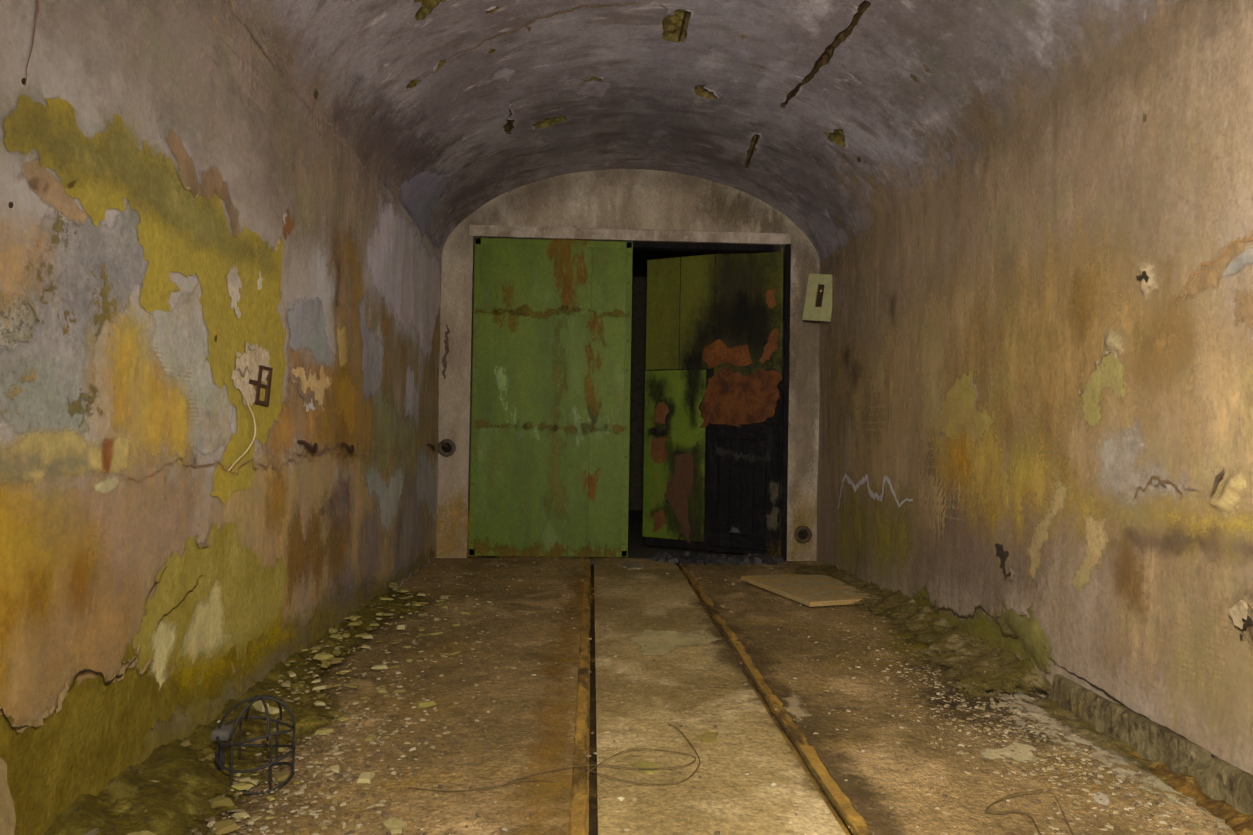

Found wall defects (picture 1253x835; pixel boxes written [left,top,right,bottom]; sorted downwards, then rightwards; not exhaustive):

crack [25,0,39,86]
spalling [411,0,449,21]
spalling [661,9,694,43]
peeling [0,78,333,504]
water stain [0,0,470,727]
rust [475,238,628,435]
water stain [825,0,1253,714]
peeling [106,522,289,694]
peeling [10,682,69,733]
water stain [909,656,1049,742]
crack [1057,664,1220,759]